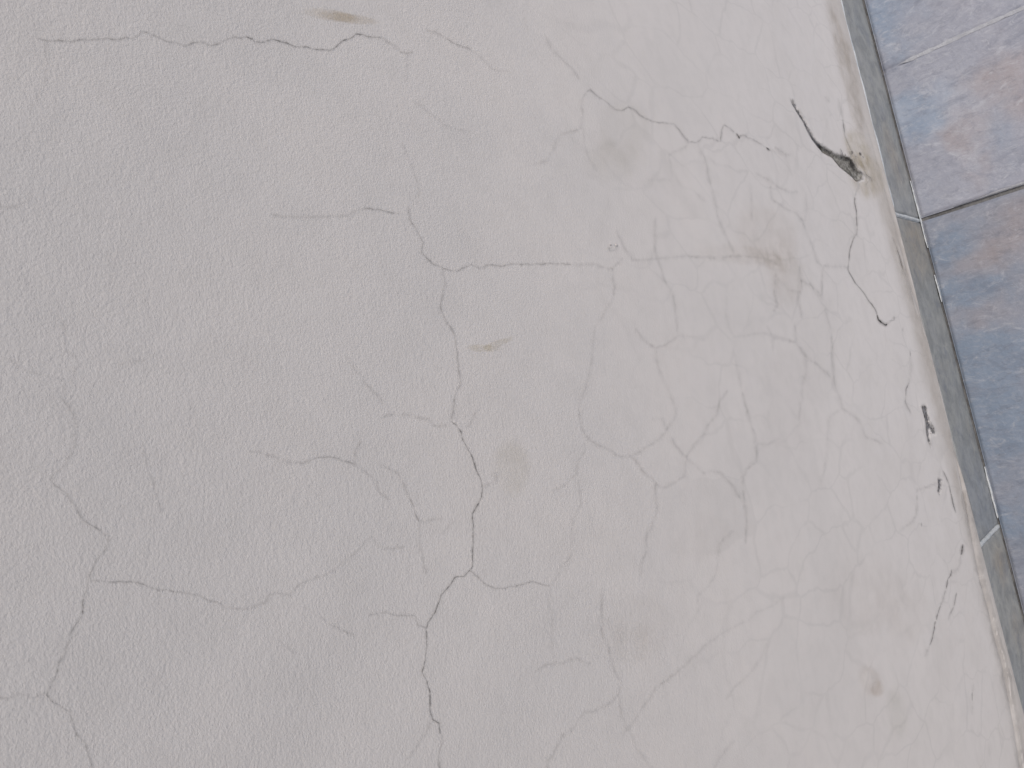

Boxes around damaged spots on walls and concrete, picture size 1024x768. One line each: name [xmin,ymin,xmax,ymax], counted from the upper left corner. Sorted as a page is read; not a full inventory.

flaking render [792,104,867,181]